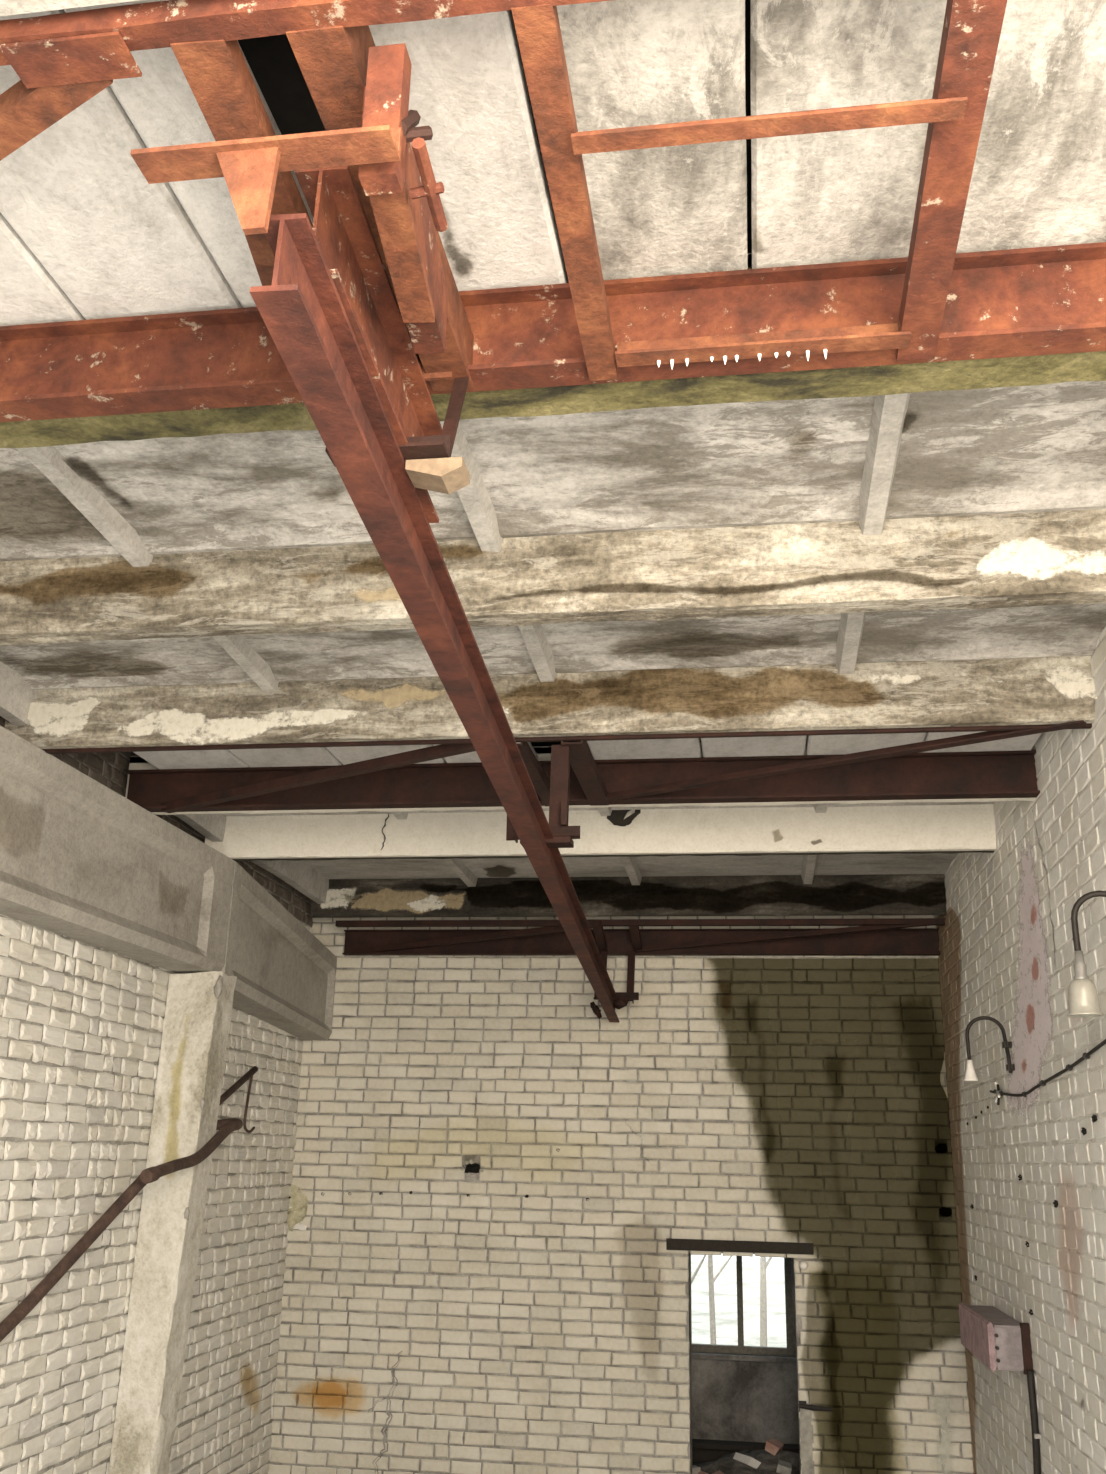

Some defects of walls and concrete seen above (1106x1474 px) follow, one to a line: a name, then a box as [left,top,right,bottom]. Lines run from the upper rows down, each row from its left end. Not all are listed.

leakage [67,460,129,506]
spalling [27,697,101,737]
spalling [117,708,364,744]
leakage [421,865,552,907]
leakage [571,880,947,913]
leakage [708,958,962,1474]